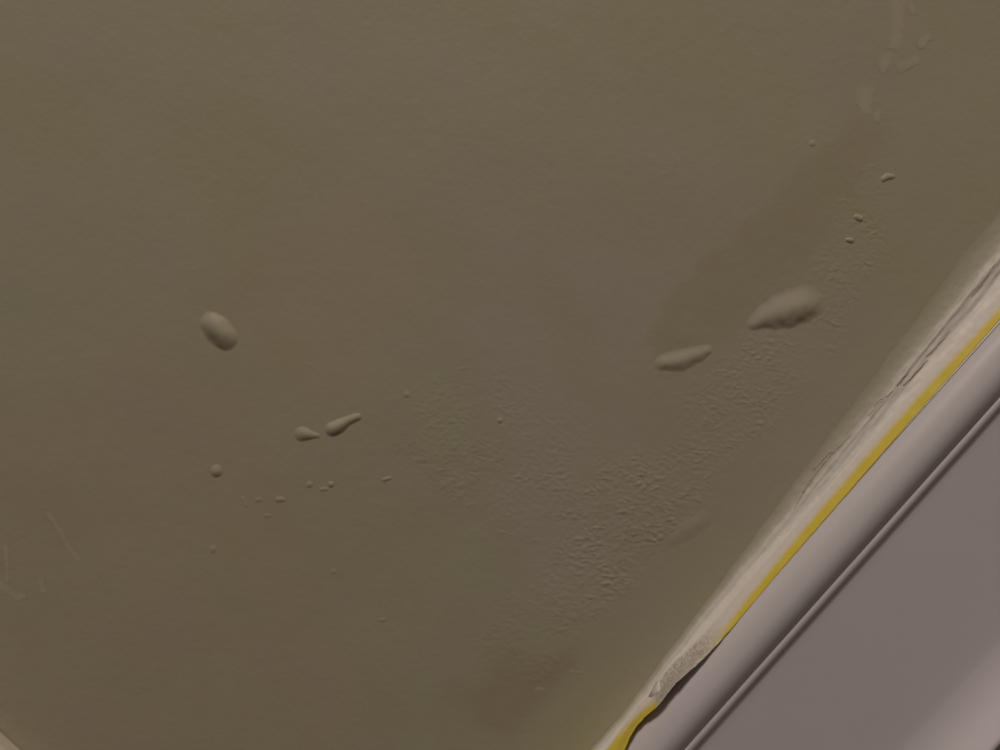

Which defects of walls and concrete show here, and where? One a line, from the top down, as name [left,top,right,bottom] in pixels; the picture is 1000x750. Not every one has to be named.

crack [870,331,950,414]